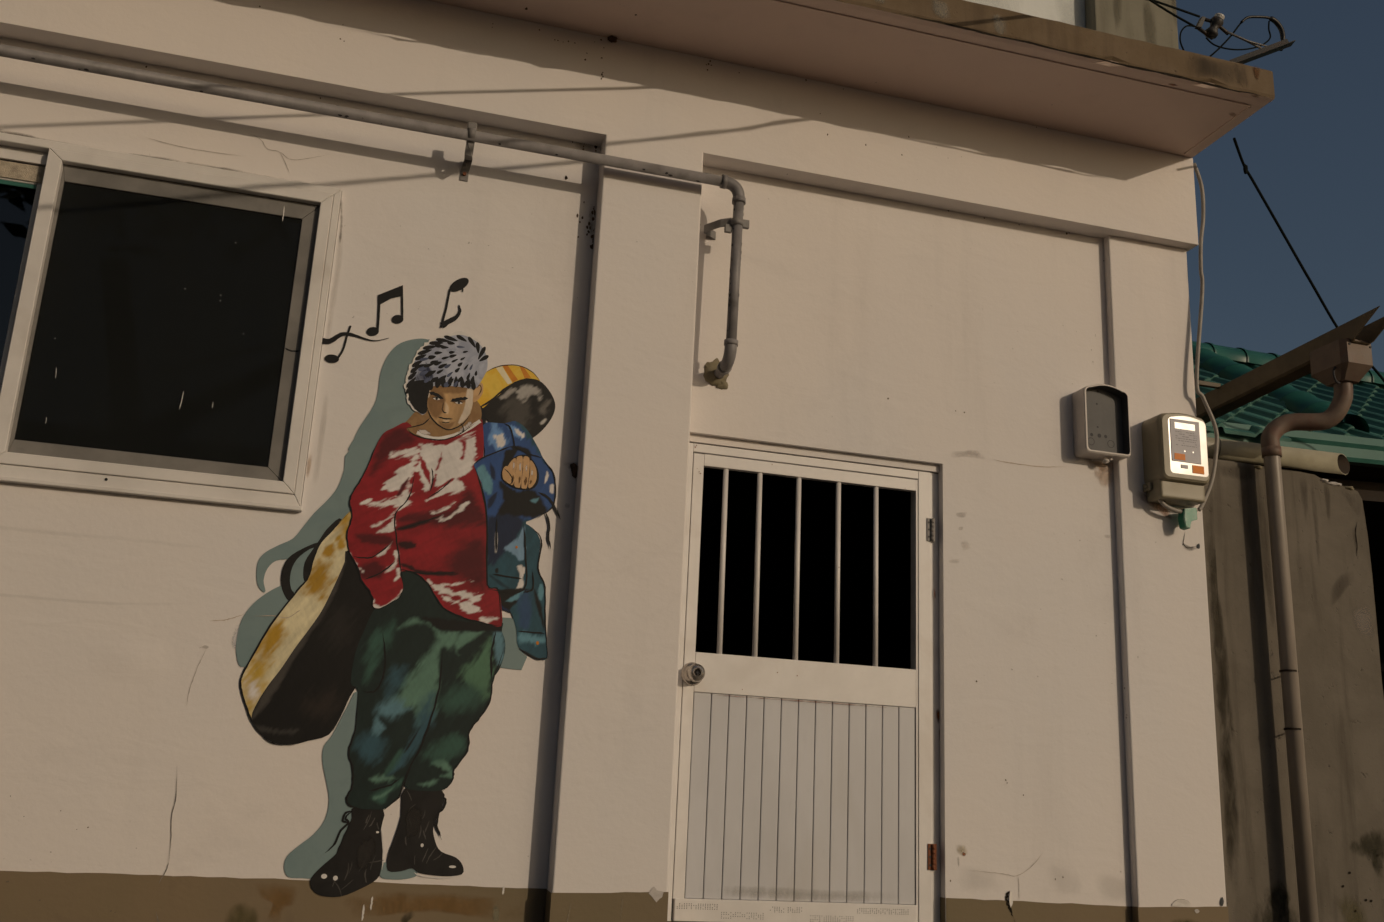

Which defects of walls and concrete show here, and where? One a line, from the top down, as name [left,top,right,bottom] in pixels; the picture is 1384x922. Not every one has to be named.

damp [1211,556,1229,712]
crack [156,781,177,922]
damp [1223,751,1235,852]
damp [1263,885,1290,922]